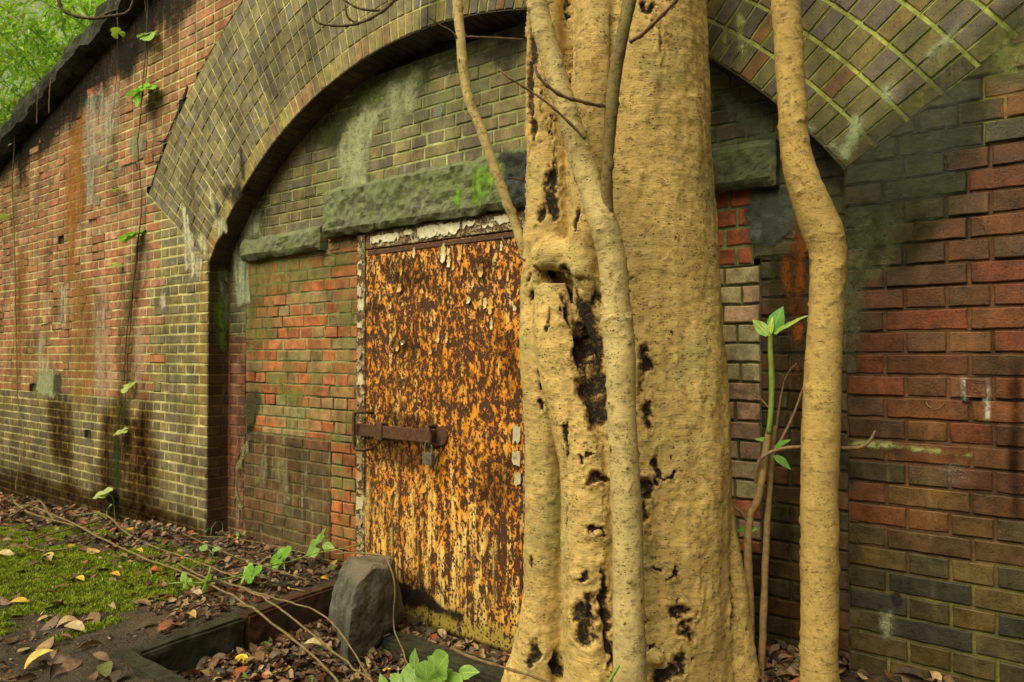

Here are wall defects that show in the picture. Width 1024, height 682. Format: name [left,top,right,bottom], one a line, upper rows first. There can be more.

rust [64,115,84,279]
water stain [182,206,207,277]
water stain [209,188,227,235]
rust [381,261,427,285]
peeling [370,214,509,329]
rust [782,233,806,341]
water stain [0,401,201,535]
rust [398,581,462,621]